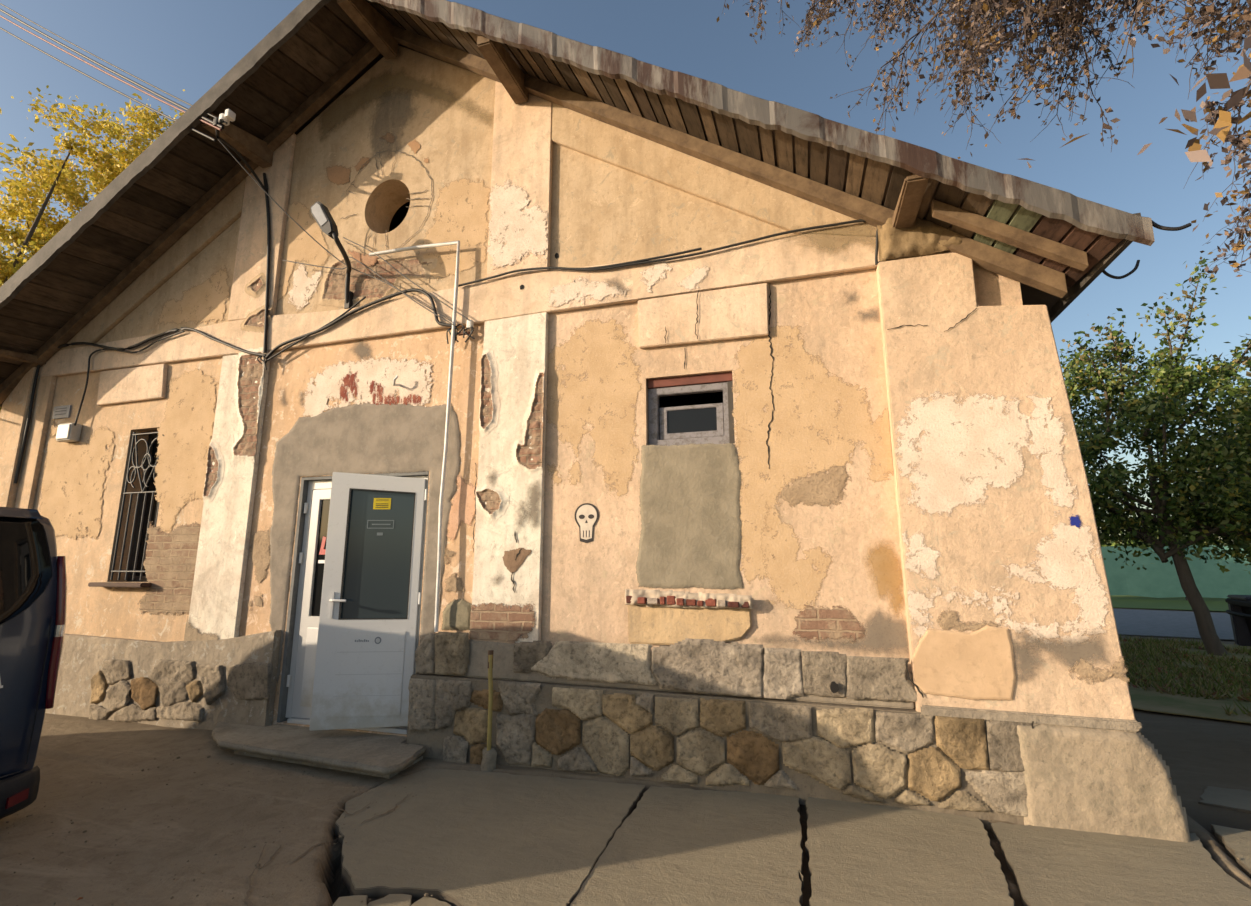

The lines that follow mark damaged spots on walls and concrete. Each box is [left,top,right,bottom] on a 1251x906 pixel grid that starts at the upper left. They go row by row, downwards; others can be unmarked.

peeling [138,178,549,616]
crack [766,285,775,469]
peeling [732,325,1109,644]
flaking render [470,602,537,644]
spalling [1068,656,1129,684]